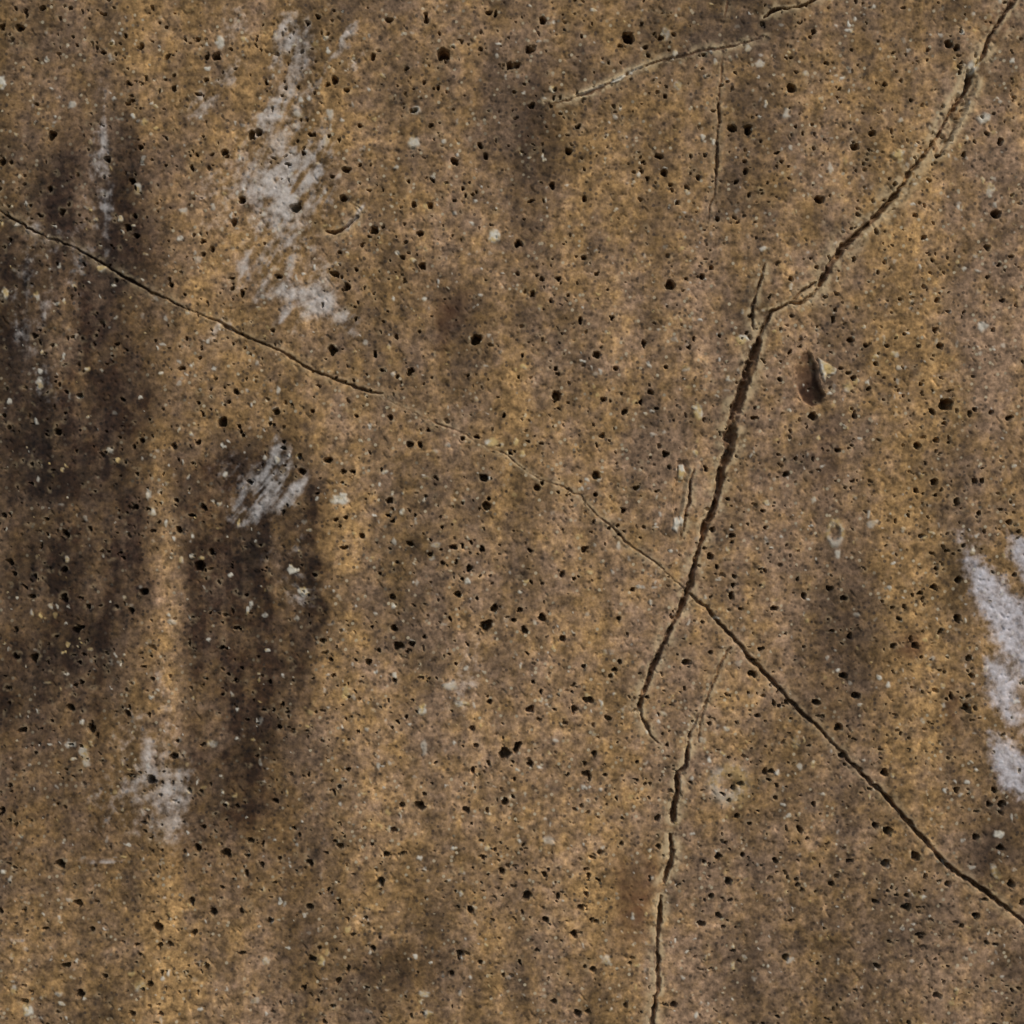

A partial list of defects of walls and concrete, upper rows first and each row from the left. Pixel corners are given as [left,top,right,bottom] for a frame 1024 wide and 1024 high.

crack [323,201,364,237]
crack [542,0,824,227]
crack [977,0,1019,63]
damp [0,0,488,1024]
crack [0,207,684,590]
crack [634,74,1024,928]
crack [648,892,665,1024]